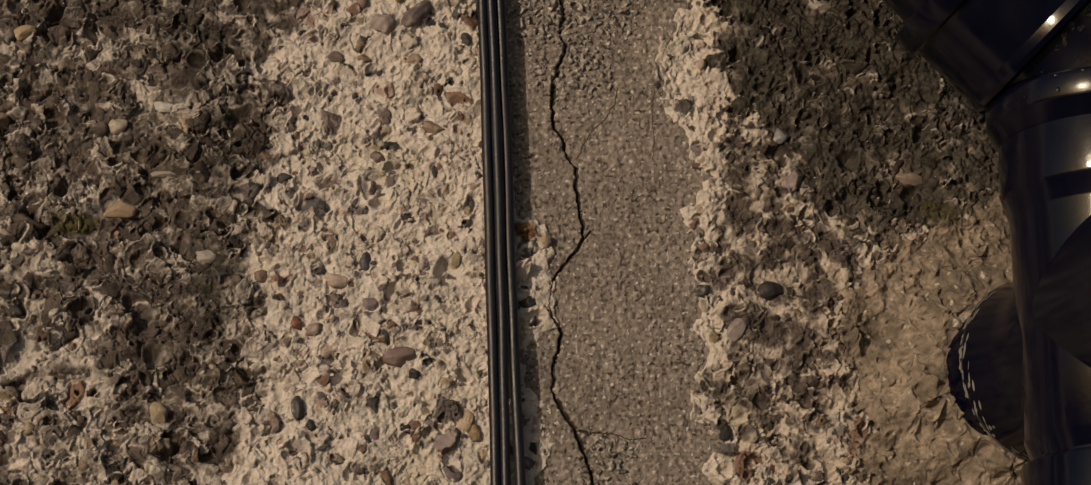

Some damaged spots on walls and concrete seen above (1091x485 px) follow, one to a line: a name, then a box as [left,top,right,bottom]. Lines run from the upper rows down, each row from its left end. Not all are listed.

crack [548,0,647,485]
crack [649,76,657,161]